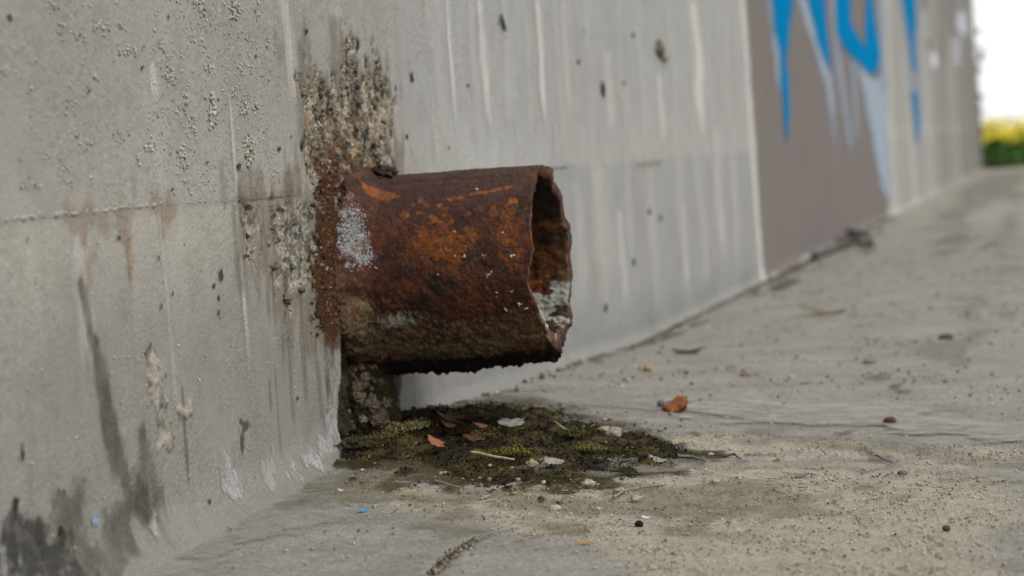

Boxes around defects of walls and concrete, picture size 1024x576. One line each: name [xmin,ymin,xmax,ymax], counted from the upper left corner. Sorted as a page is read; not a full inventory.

leakage [74,238,159,544]
rust [308,149,352,396]
spalling [291,20,397,193]
rust [371,164,399,179]